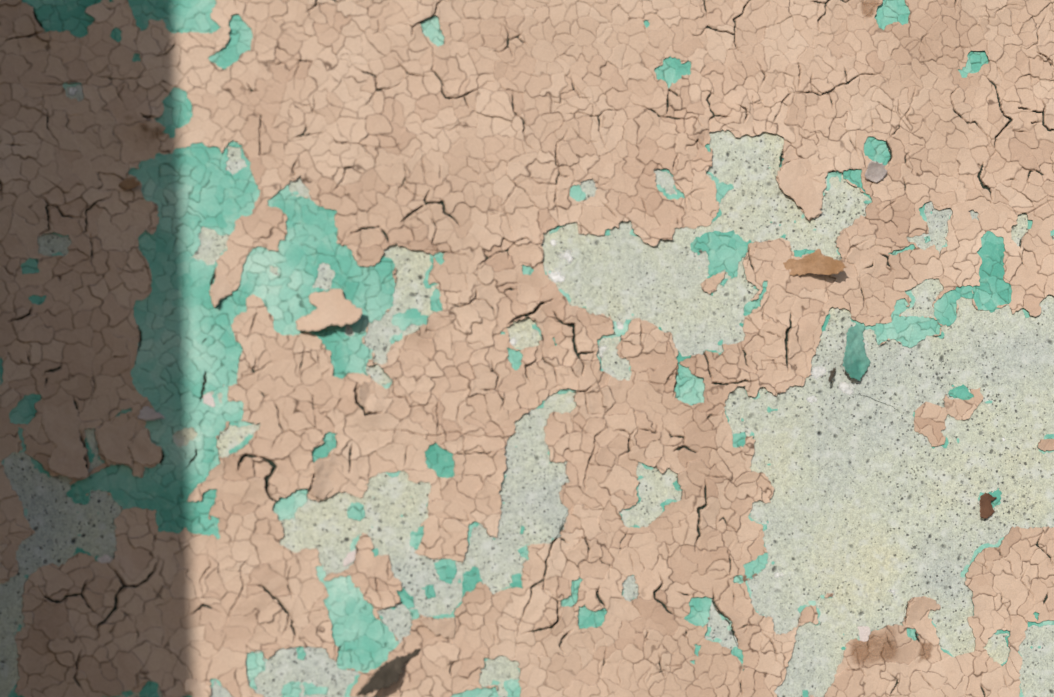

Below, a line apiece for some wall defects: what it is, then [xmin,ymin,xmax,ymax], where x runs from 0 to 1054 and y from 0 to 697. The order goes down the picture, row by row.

peeling [22,0,113,38]
peeling [128,0,253,69]
crack [953,80,1054,196]
crack [353,168,458,253]
crack [454,288,593,363]
spalling [522,130,891,406]
peeling [0,87,444,697]
crack [237,454,278,503]
spalling [724,213,1054,697]
spalling [245,391,576,697]
crack [523,511,626,647]
crack [653,560,746,646]